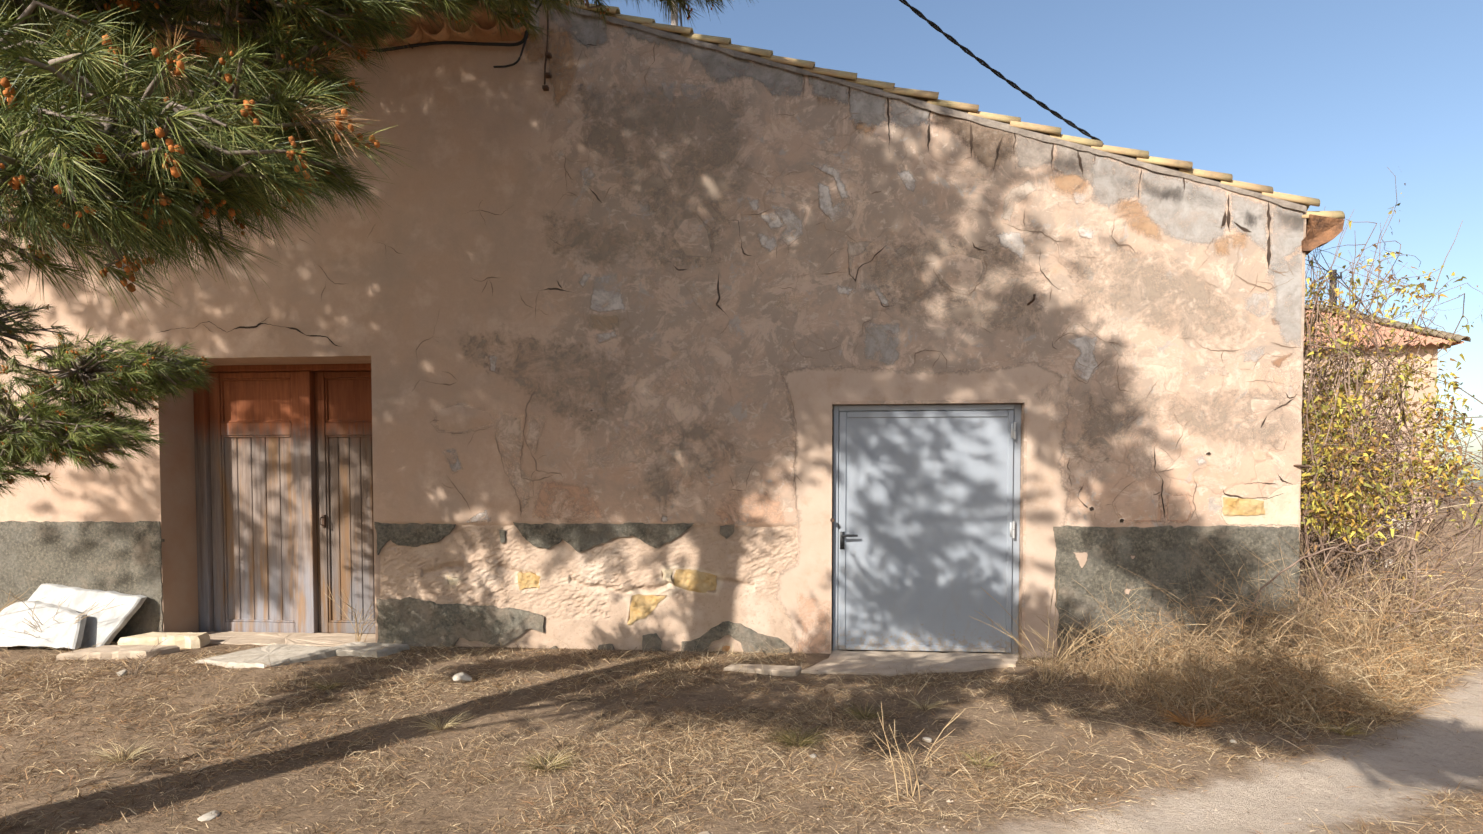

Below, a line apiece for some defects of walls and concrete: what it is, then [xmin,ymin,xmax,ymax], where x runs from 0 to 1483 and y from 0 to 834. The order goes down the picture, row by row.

crack [839,87,1016,167]
crack [1051,143,1095,194]
crack [161,238,342,347]
crack [470,237,574,315]
crack [673,167,1214,522]
crack [1186,195,1301,452]
crack [431,389,563,515]
spalling [374,494,798,653]